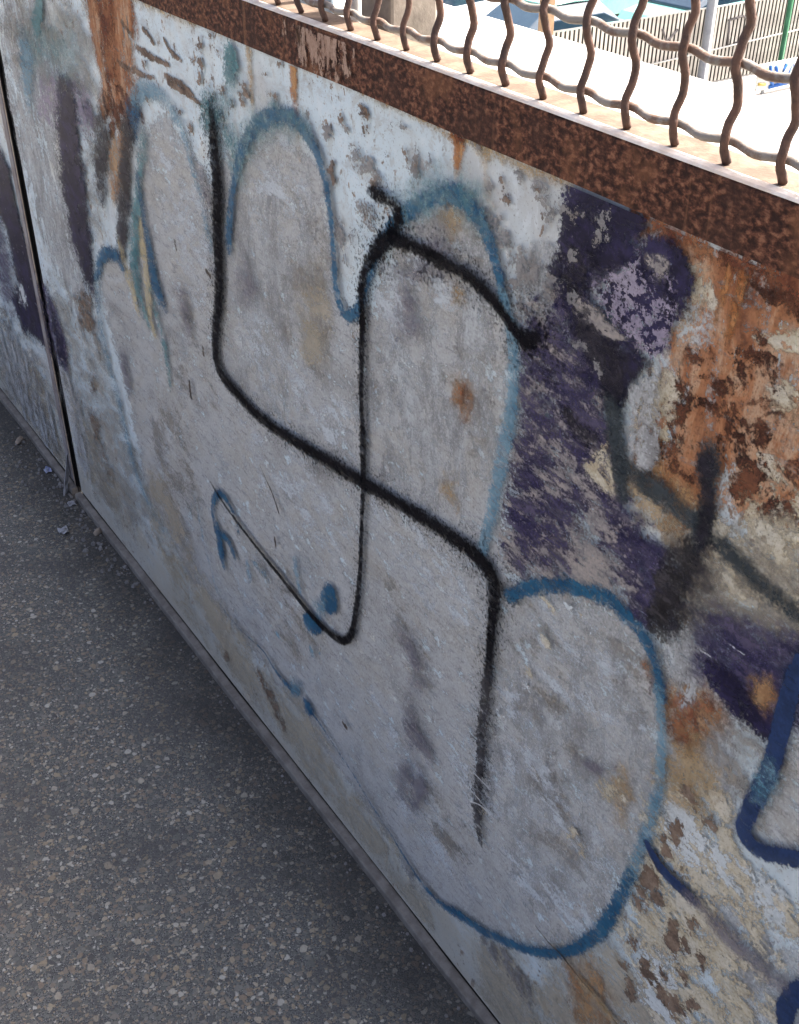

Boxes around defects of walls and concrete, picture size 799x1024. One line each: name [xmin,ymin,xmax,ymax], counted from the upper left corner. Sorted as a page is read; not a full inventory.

rust [85,0,203,201]
rust [290,65,299,138]
rust [409,115,564,184]
rust [628,208,799,554]
rust [641,660,730,758]